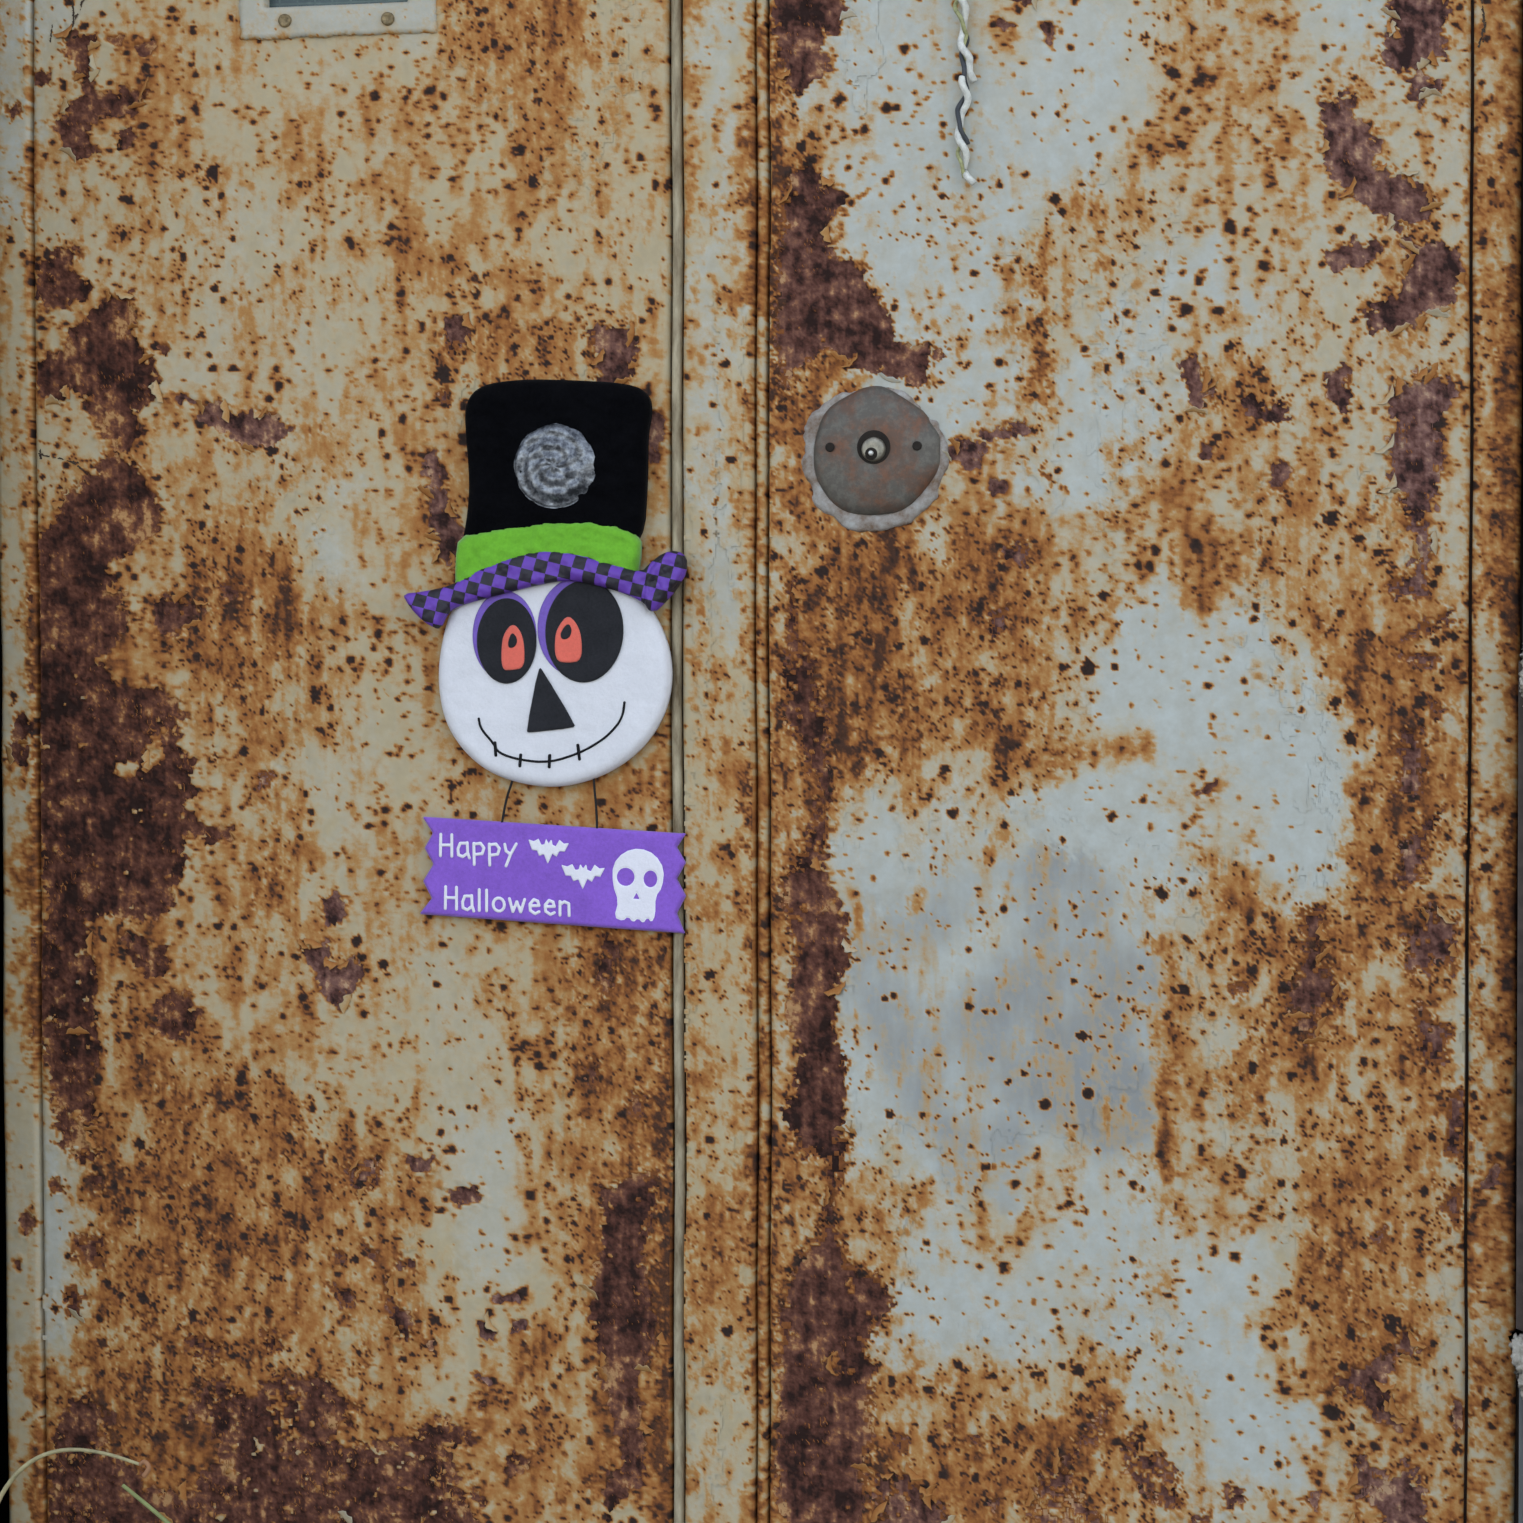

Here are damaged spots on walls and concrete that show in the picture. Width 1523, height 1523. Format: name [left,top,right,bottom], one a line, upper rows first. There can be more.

rust [417,0,656,201]
peeling [1319,88,1466,337]
peeling [1380,0,1453,110]
rust [421,305,602,439]
peeling [1177,353,1219,414]
peeling [1240,392,1292,423]
peeling [1323,362,1353,415]
peeling [1373,362,1460,602]
rust [159,453,349,834]
rust [542,46,1214,1523]
rust [1169,457,1511,1473]
rust [43,1041,447,1467]